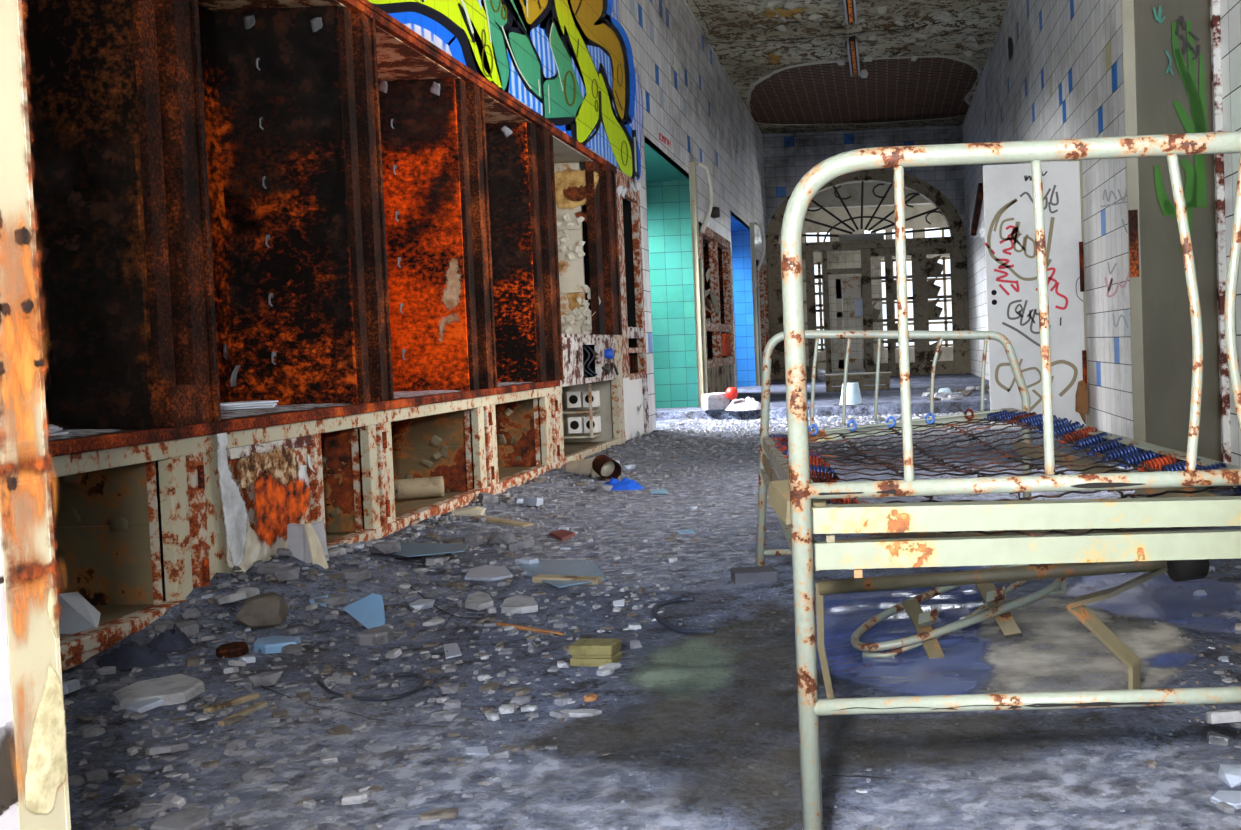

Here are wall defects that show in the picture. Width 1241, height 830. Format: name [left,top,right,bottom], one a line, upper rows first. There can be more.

corrosion [18,2,34,185]
spalling [746,0,982,125]
corrosion [0,205,560,638]